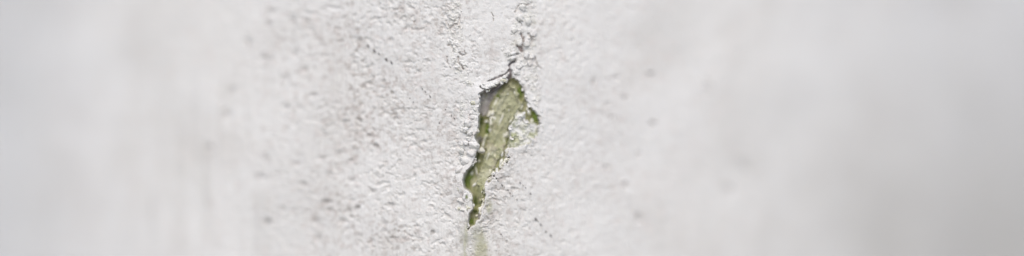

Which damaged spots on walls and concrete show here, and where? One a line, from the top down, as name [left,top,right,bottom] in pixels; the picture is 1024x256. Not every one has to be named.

peeling [455,75,541,229]